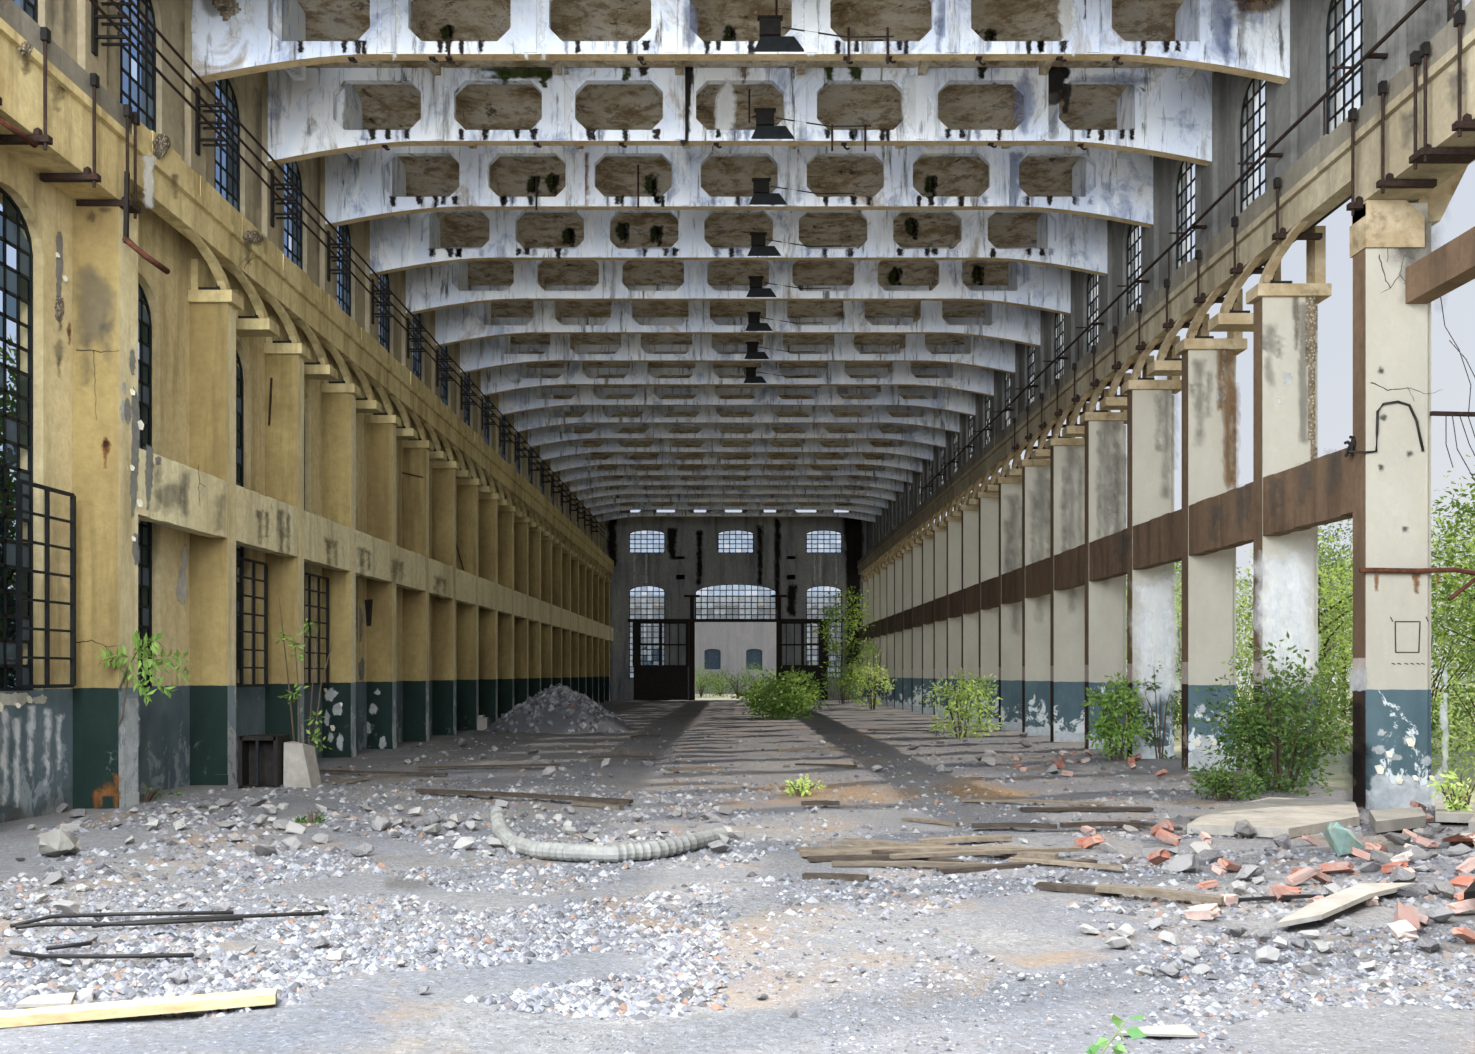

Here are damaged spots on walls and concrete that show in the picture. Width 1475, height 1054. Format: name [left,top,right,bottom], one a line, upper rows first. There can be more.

spalling [191,0,250,37]
spalling [1233,0,1281,42]
peeling [0,692,47,712]
peeling [324,688,343,750]
peeling [1266,667,1475,943]